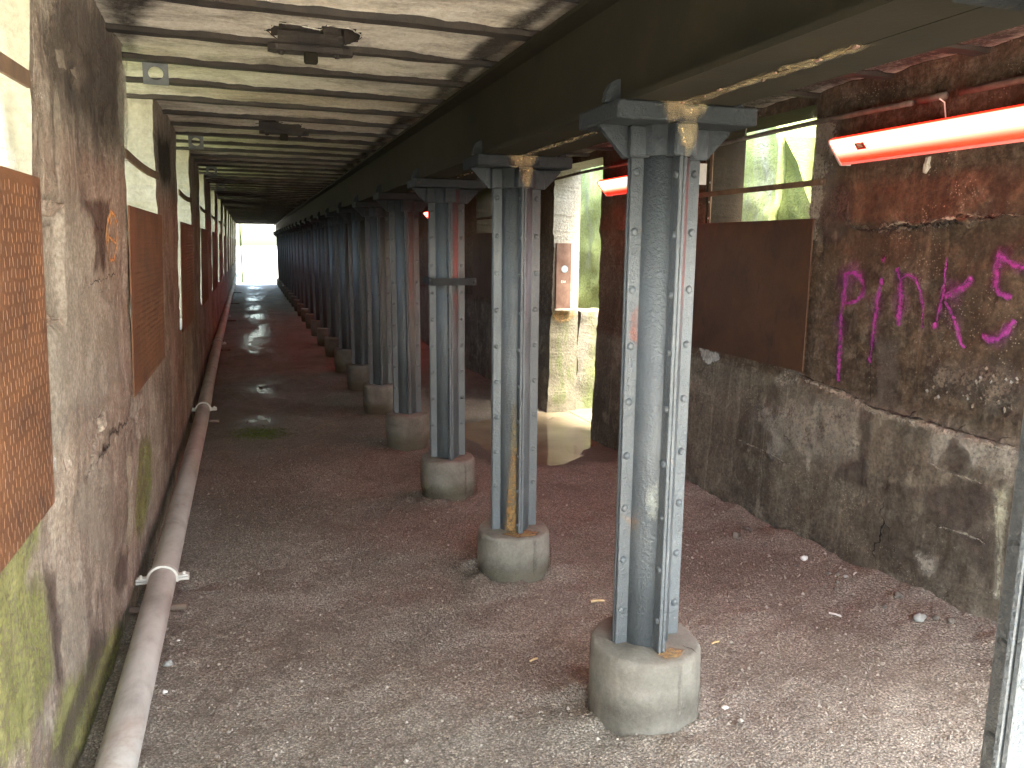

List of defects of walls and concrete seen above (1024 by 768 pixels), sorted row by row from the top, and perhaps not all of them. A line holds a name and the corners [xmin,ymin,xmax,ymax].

crack [86,406,128,478]
corrosion [504,420,538,538]